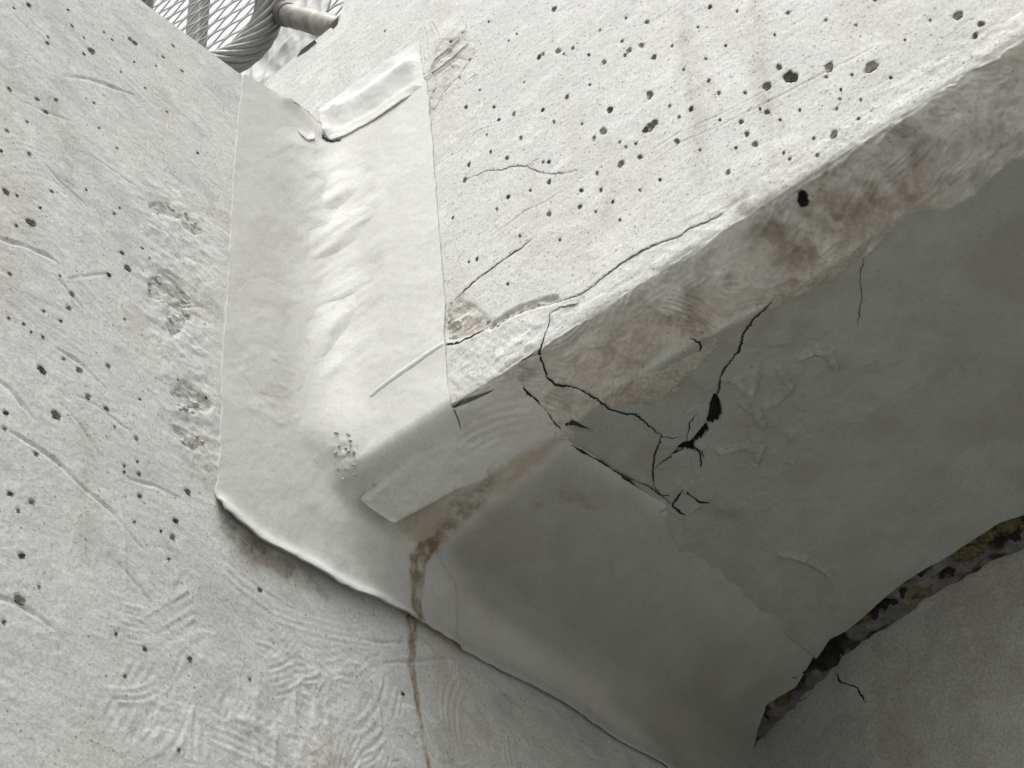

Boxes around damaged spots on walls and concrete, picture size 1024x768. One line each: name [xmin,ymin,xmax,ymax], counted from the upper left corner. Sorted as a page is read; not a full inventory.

crack [455,239,532,300]
crack [446,328,488,345]
crack [520,214,772,516]
rust [407,539,437,653]
crack [836,673,866,703]